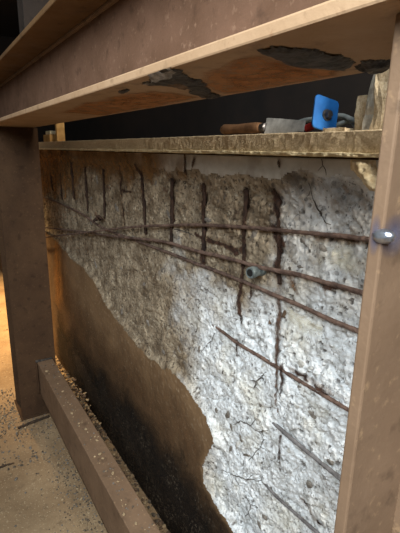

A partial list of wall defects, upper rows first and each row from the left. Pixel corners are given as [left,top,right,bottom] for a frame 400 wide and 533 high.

peeling [140,67,221,99]
peeling [257,45,391,75]
rust [271,189,282,217]
crack [308,183,331,225]
rust [194,214,246,324]
rust [269,224,285,277]
spalling [43,165,375,533]
rust [274,299,283,413]
leakage [57,316,227,533]
crack [233,420,268,461]